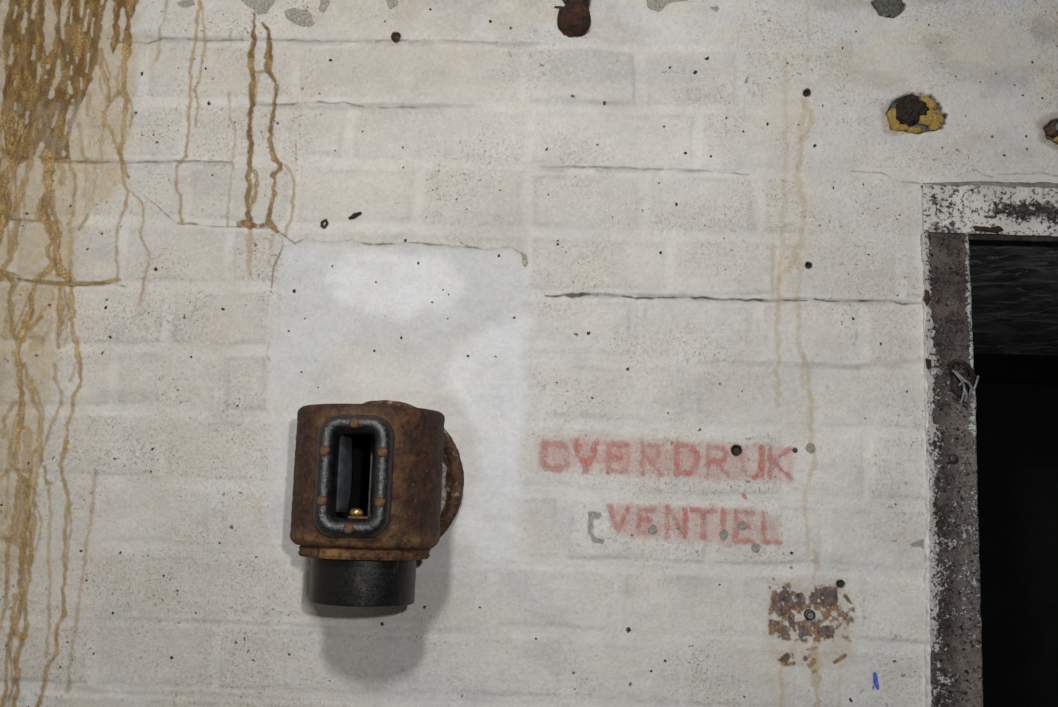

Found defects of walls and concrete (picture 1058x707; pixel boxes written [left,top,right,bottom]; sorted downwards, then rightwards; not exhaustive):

spalling [882,94,947,134]
spalling [1038,116,1058,148]
corrosion [769,578,854,673]